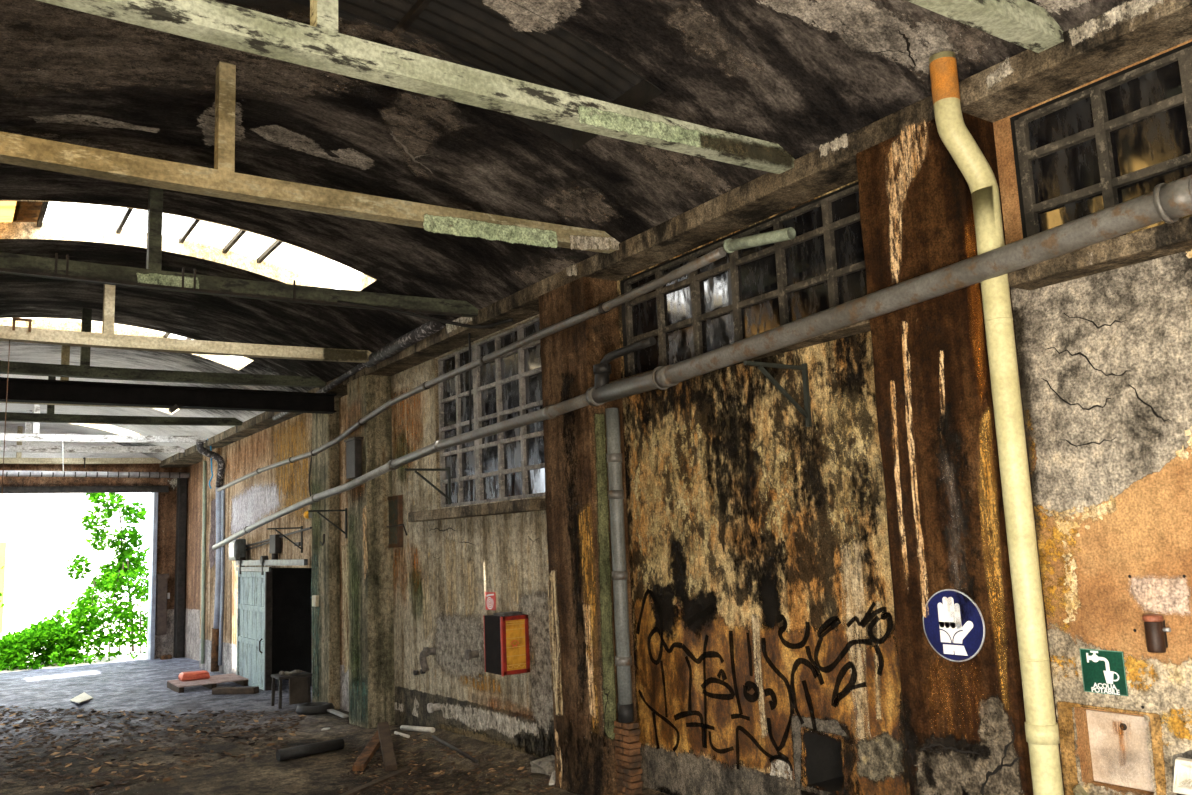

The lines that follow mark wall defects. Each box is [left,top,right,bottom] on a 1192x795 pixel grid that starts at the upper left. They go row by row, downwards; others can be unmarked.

peeling [0,0,375,170]
peeling [338,17,455,62]
peeling [482,0,583,35]
peeling [756,0,1012,89]
peeling [380,92,462,179]
peeling [888,120,927,284]
water stain [621,321,992,795]
flaking render [1010,250,1192,795]
spalling [770,695,1024,795]